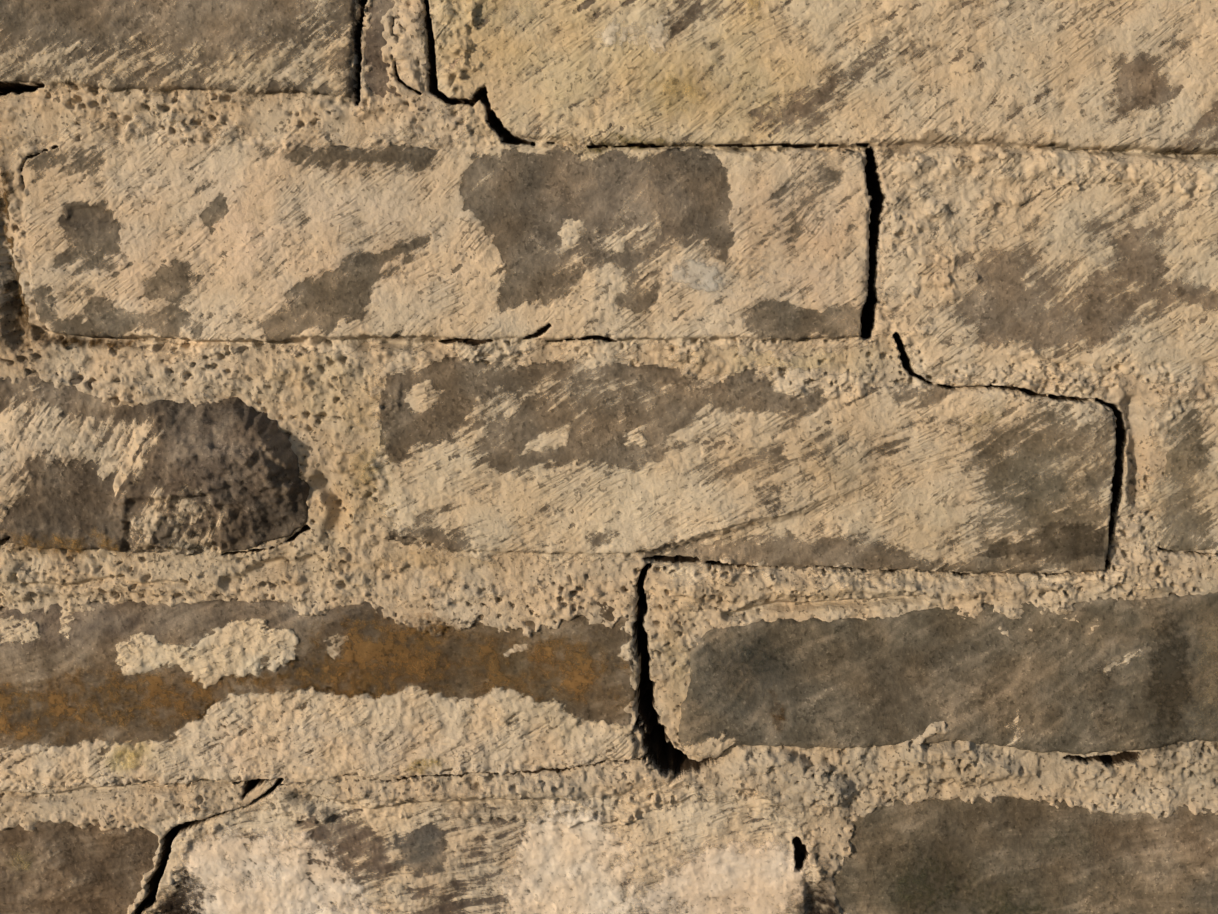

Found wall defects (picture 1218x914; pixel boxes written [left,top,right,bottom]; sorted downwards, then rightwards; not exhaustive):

crack [0,81,45,96]
crack [354,0,664,148]
crack [439,338,493,346]
crack [523,323,617,342]
crack [696,143,1126,576]
crack [221,525,311,555]
crack [355,555,778,783]
crack [135,778,284,914]
crack [792,836,809,870]